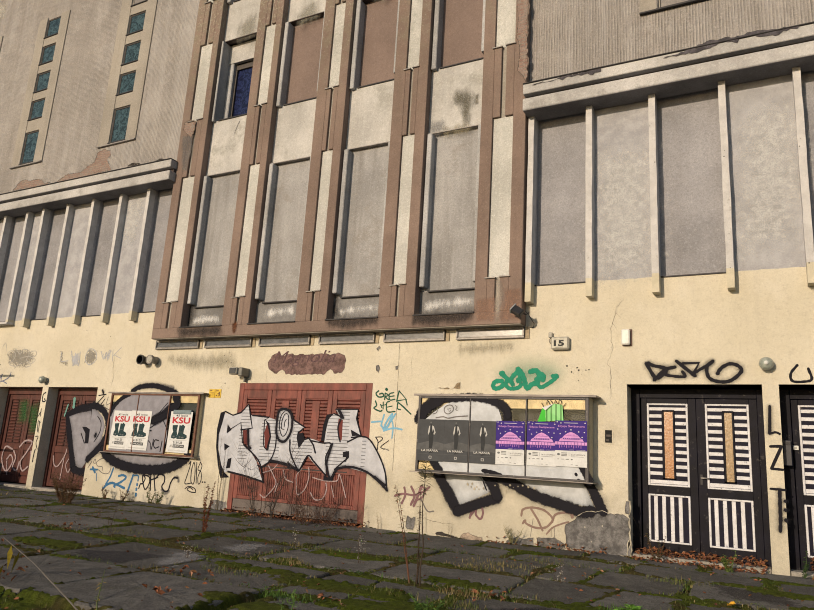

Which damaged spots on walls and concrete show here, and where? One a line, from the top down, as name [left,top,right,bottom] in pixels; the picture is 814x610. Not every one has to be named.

spalling [516,0,601,85]
damp [432,93,478,132]
spalling [13,149,112,191]
spalling [506,501,633,557]